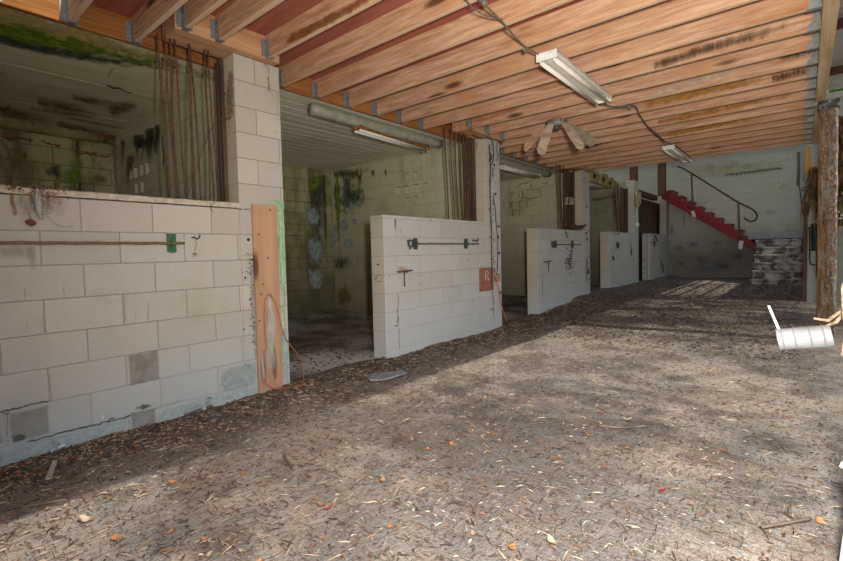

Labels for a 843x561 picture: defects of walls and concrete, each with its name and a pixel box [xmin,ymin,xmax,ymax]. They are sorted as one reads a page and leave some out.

damp [134,125,164,164]
damp [306,169,364,288]